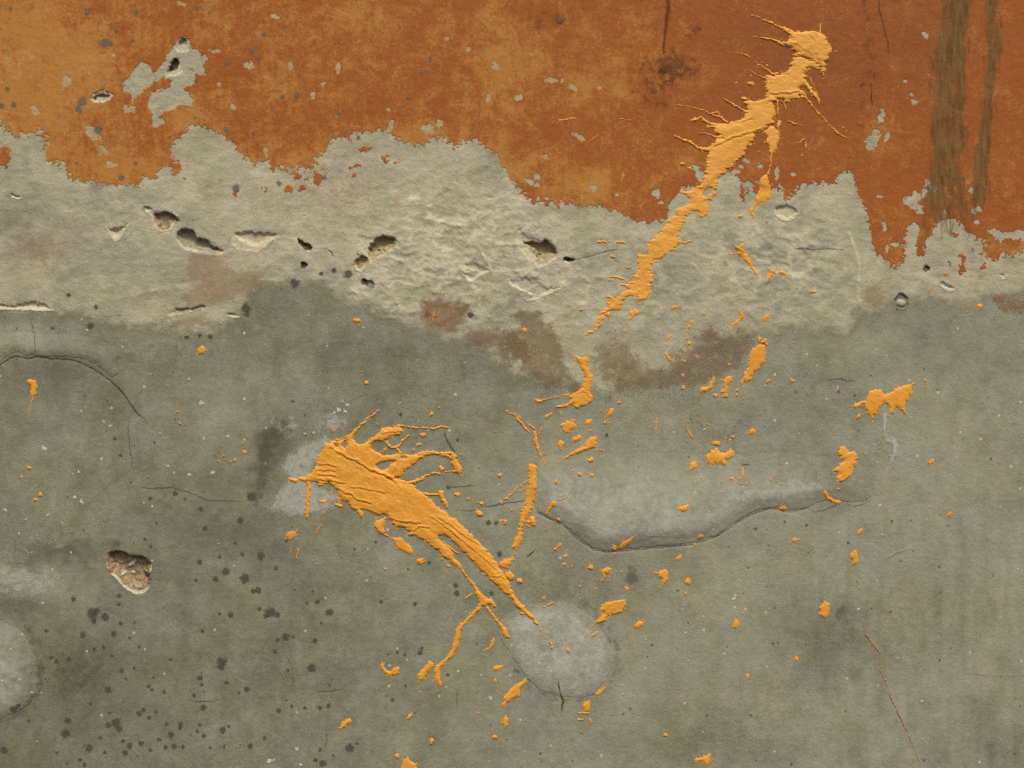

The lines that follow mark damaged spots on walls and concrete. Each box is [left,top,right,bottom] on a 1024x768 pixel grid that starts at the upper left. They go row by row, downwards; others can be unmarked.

peeling [0,105,1024,394]
crack [0,316,234,501]
spalling [106,550,152,594]